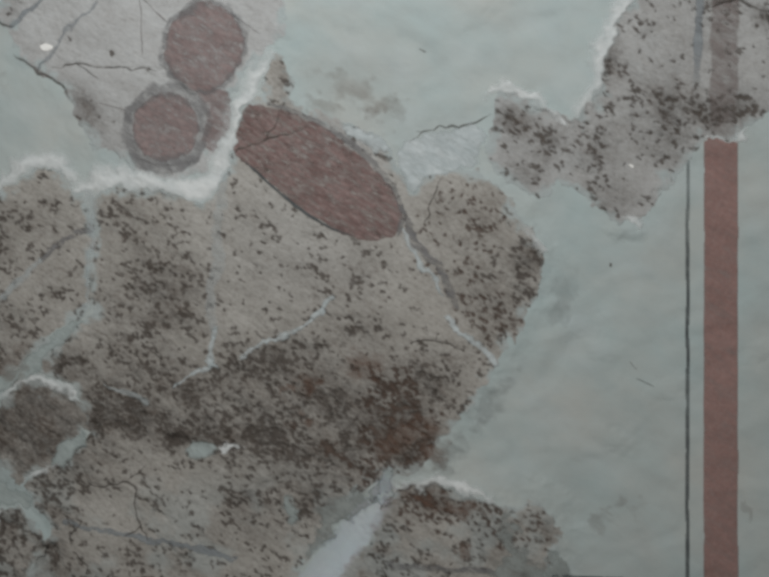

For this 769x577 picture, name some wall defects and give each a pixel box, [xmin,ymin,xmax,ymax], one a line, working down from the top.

crack [13,54,155,88]
spalling [494,106,605,172]
spalling [602,60,766,152]
spalling [98,192,154,244]
spalling [451,184,507,282]
spalling [509,237,543,303]
spalling [2,287,78,347]
spalling [459,293,517,375]
spalling [52,250,471,546]
spalling [32,465,91,526]
spalling [0,510,102,577]
spalling [368,487,549,576]